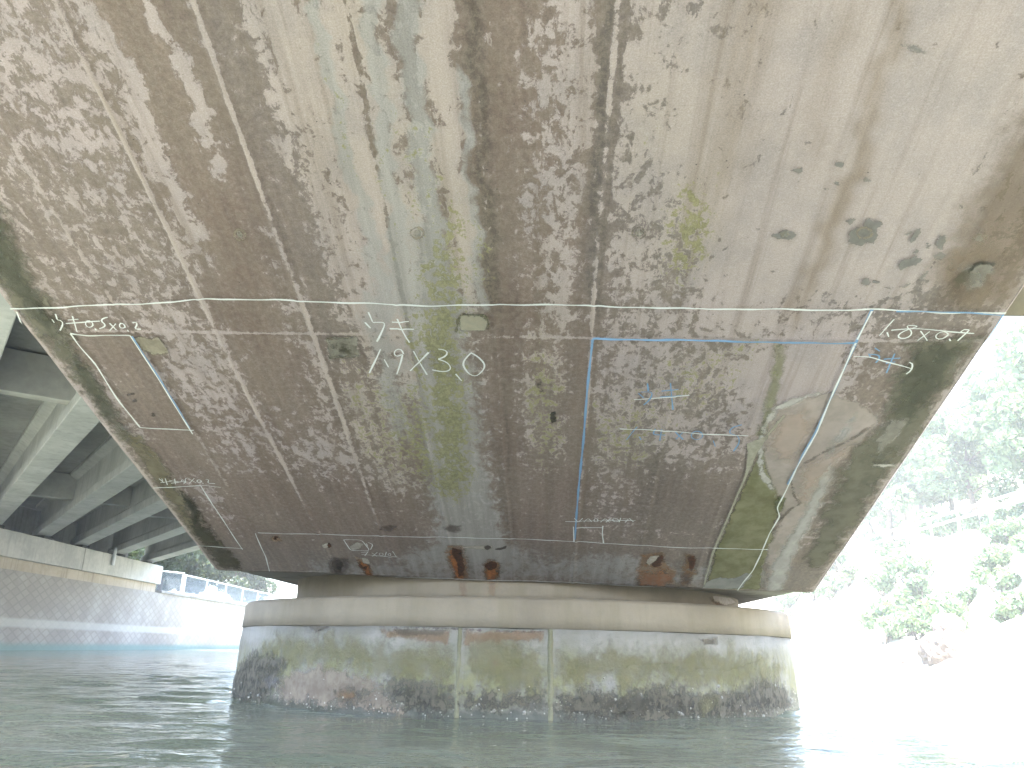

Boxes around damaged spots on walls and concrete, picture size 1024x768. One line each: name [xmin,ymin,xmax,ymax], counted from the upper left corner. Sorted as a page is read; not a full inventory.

damp [757,393,878,591]
rust [445,545,469,580]
rust [482,559,500,580]
rust [636,552,697,587]
damp [387,629,448,643]